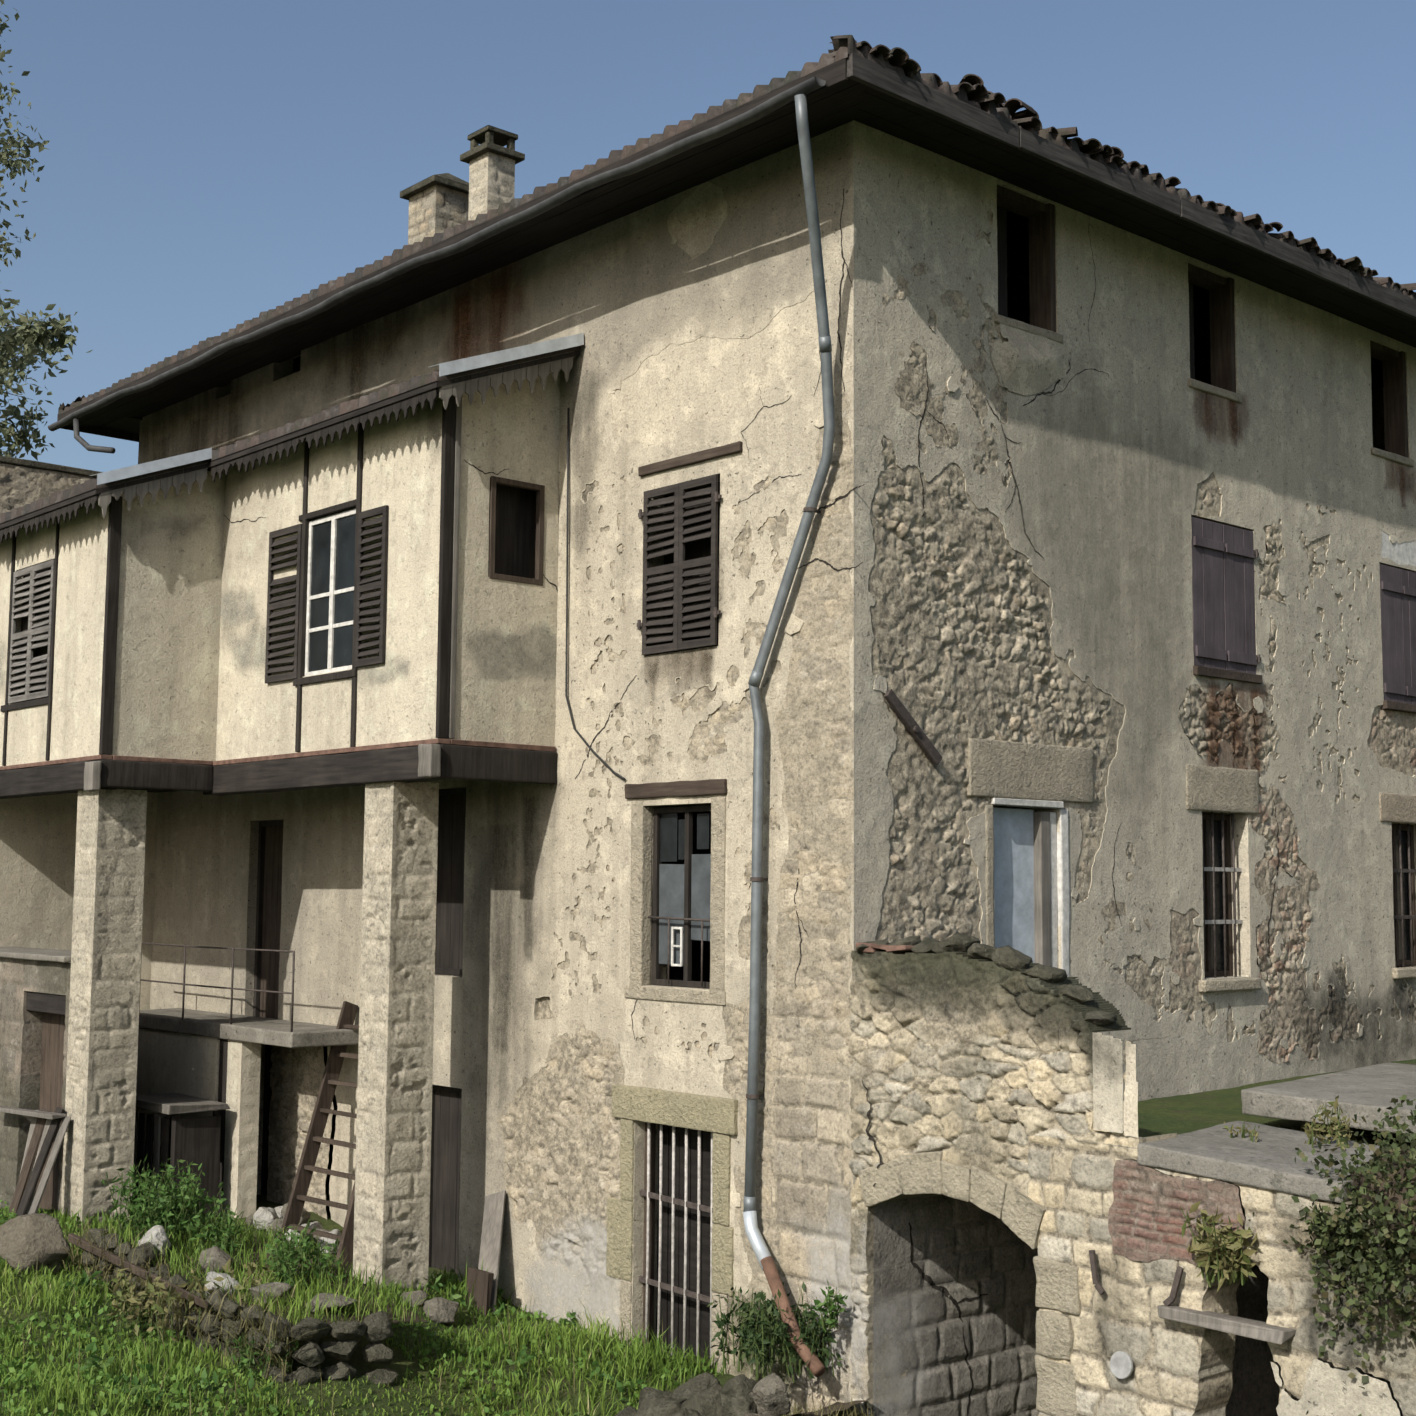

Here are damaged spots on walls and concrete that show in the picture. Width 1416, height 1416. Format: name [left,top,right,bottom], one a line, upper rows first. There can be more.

crack [735,189,853,506]
flaking render [883,262,927,306]
crack [797,558,863,572]
crack [817,484,865,510]
crack [918,359,949,517]
crack [987,400,1044,559]
flaking render [1194,472,1226,517]
flaking render [538,282,1125,1416]
flaking render [1098,520,1416,1064]
flaking render [497,1024,625,1290]
crack [908,1222,988,1416]
peeling [1271,1362,1282,1386]